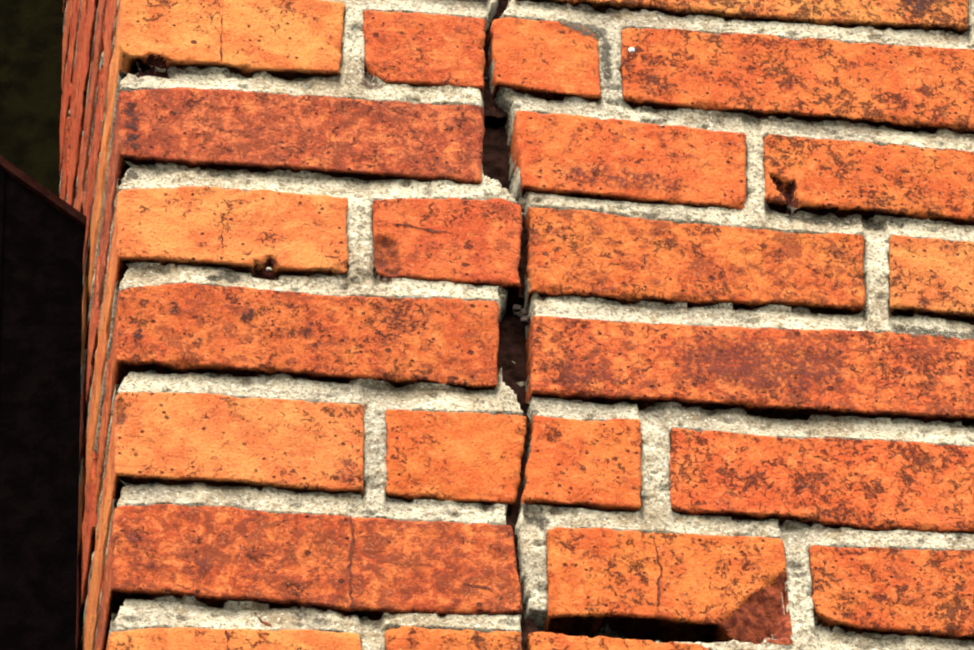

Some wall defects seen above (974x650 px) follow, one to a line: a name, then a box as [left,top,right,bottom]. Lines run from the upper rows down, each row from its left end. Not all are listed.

crack [482,0,531,580]
crack [520,614,538,650]
spalling [720,572,793,645]